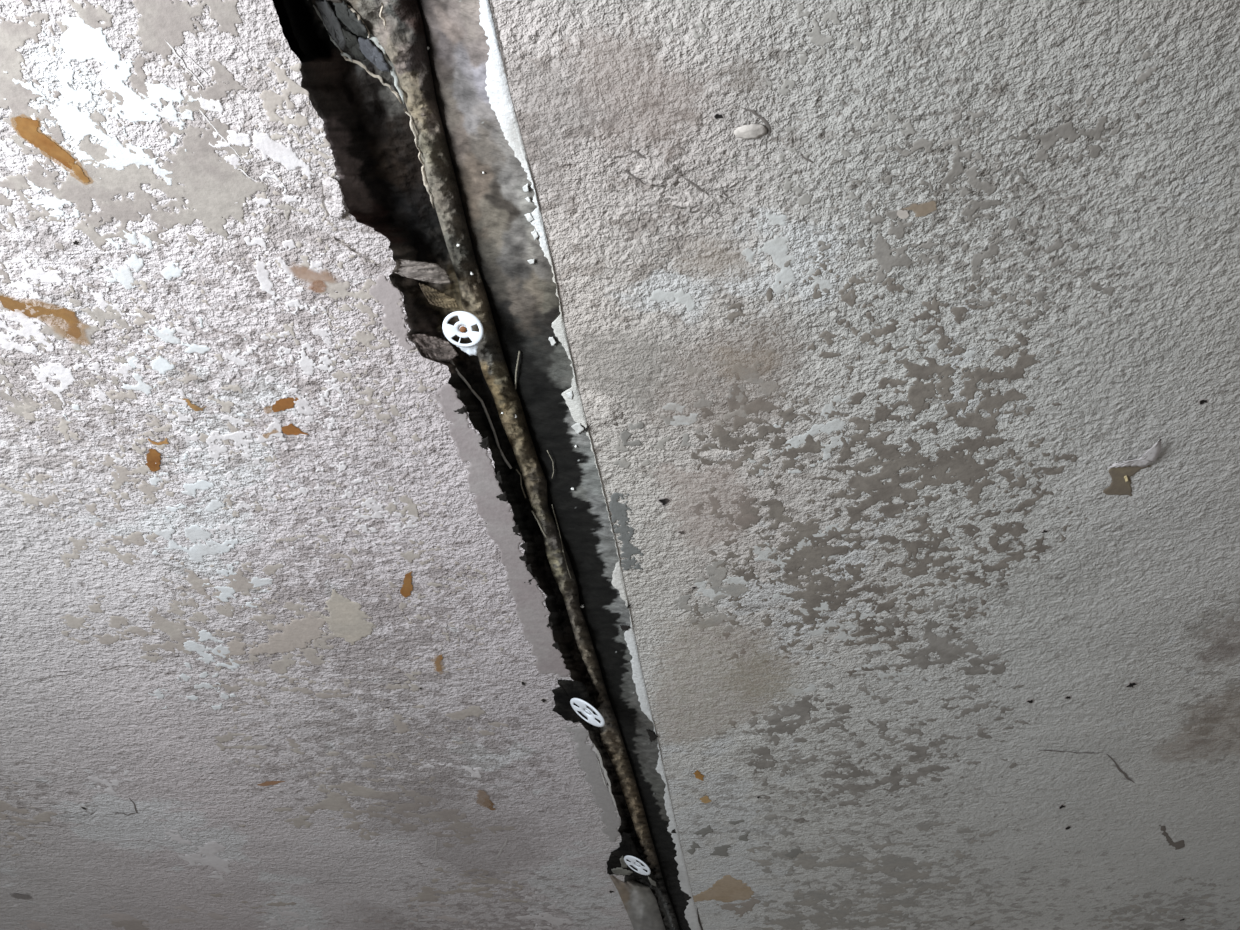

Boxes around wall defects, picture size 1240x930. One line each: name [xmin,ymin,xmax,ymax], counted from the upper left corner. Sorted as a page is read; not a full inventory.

corrosion [15,116,90,183]
corrosion [0,296,80,339]
corrosion [263,397,308,438]
corrosion [146,438,169,472]
spalling [0,0,672,930]
peeling [479,0,1179,930]
corrosion [400,571,413,598]
peeling [1159,825,1185,850]